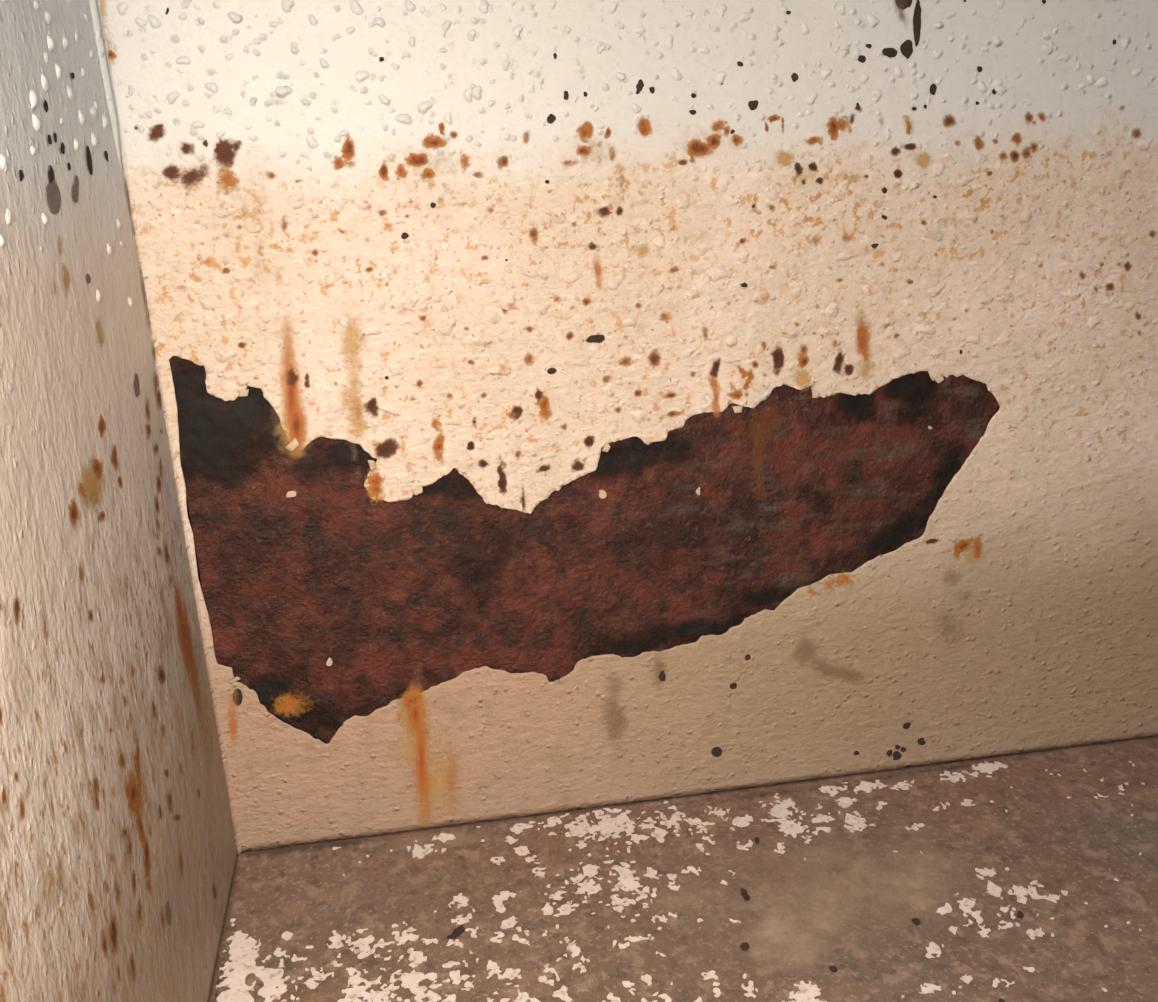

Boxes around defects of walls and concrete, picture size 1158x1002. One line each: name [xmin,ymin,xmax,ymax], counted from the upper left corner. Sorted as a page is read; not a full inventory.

rust [162,140,241,194]
rust [334,135,355,170]
rust [379,123,457,180]
rust [678,120,742,165]
peeling [583,335,605,343]
rust [833,320,871,376]
rust [283,346,310,452]
rust [710,342,784,415]
rust [375,439,398,459]
rust [467,442,521,493]
peeling [169,356,1000,744]
leakage [742,848,951,964]